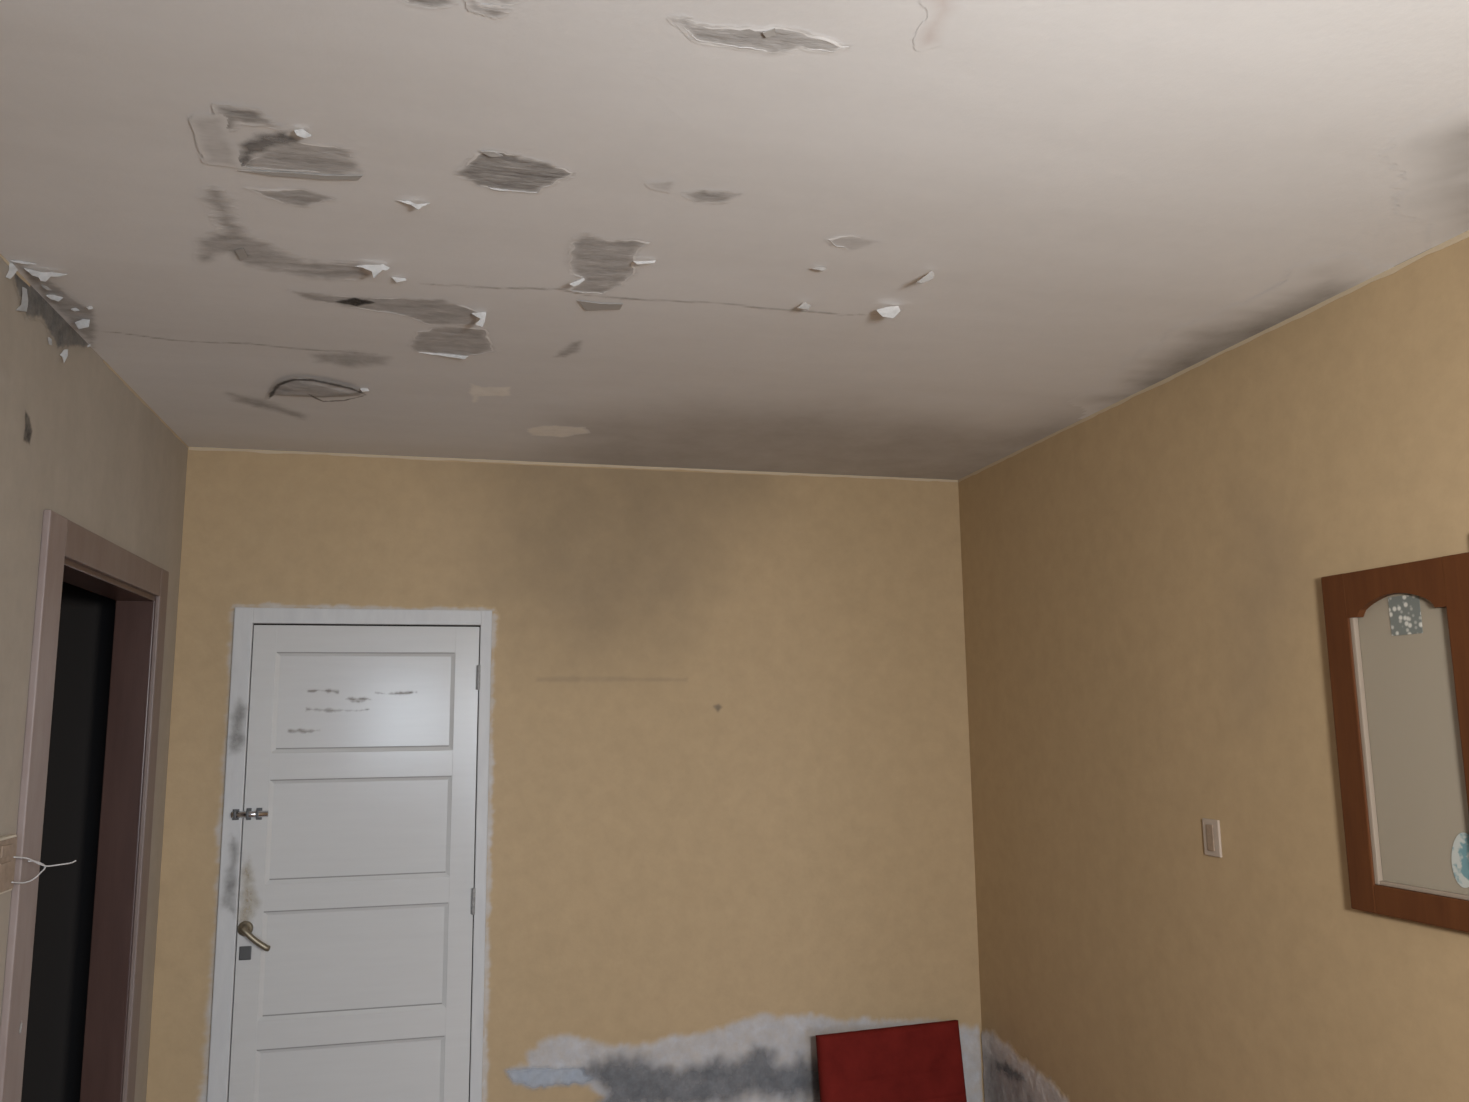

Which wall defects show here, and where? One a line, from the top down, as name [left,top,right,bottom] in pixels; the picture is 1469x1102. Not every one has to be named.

peeling [399,0,527,19]
peeling [665,14,853,57]
peeling [452,148,577,195]
flaking render [5,258,102,363]
peeling [189,103,497,359]
peeling [563,231,656,311]